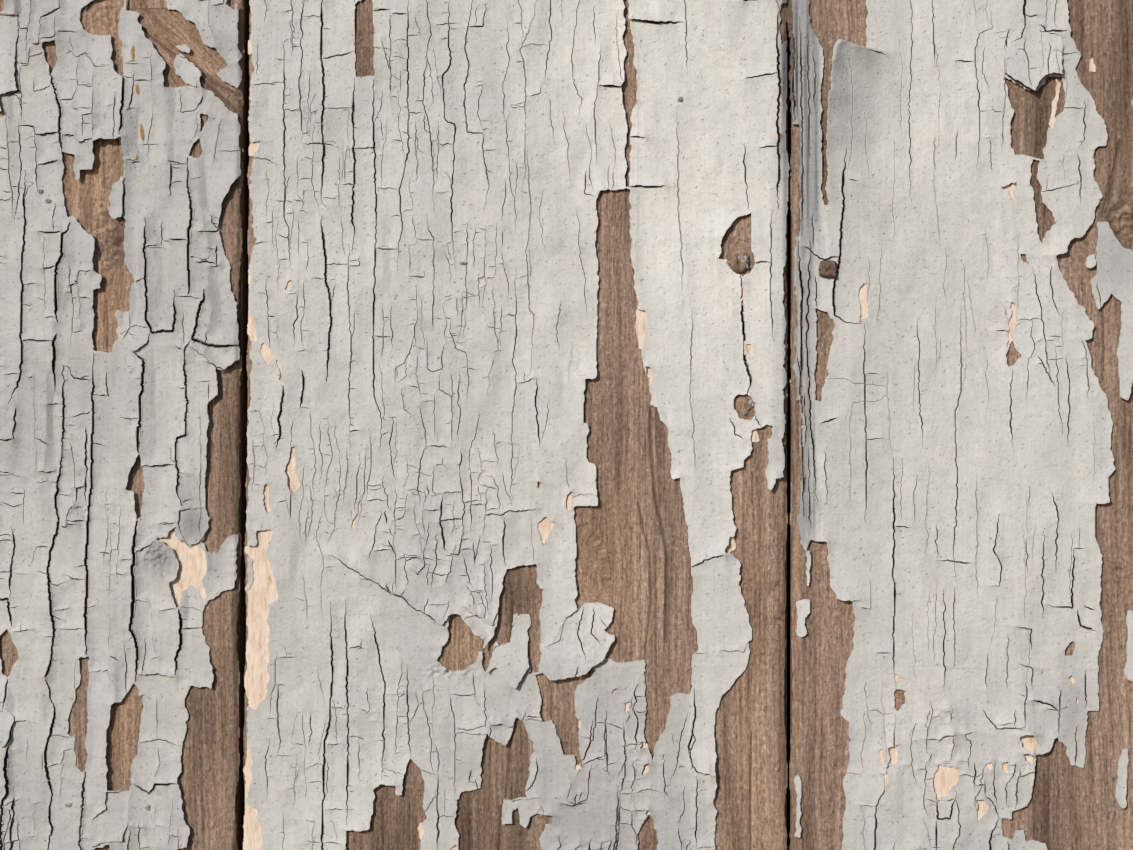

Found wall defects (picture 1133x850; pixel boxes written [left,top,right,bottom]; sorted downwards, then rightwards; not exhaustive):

peeling [62,136,149,353]
peeling [80,0,261,319]
peeling [175,335,253,850]
peeling [350,0,379,77]
peeling [437,0,700,765]
peeling [713,123,857,850]
peeling [809,0,870,205]
crack [740,0,1105,850]
peeling [996,0,1133,850]
peeling [91,678,143,850]
peeling [346,759,429,850]
peeling [455,717,552,850]